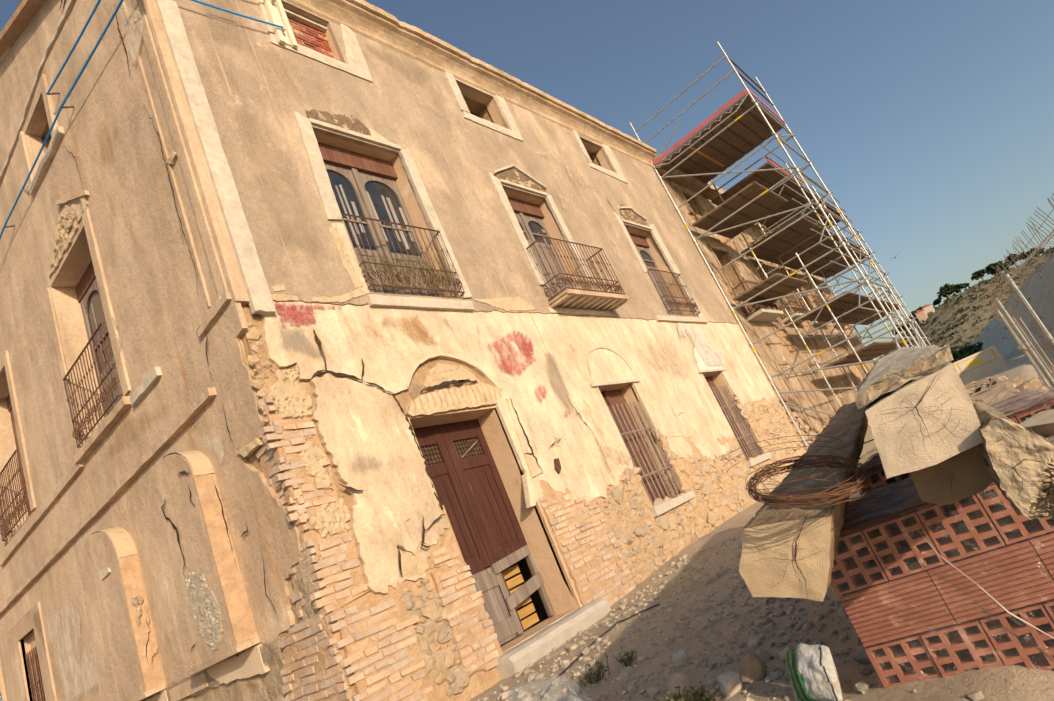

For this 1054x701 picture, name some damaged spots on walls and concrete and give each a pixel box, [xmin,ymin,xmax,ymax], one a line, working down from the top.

spalling [236,322,381,615]
crack [300,313,477,510]
spalling [184,572,223,651]